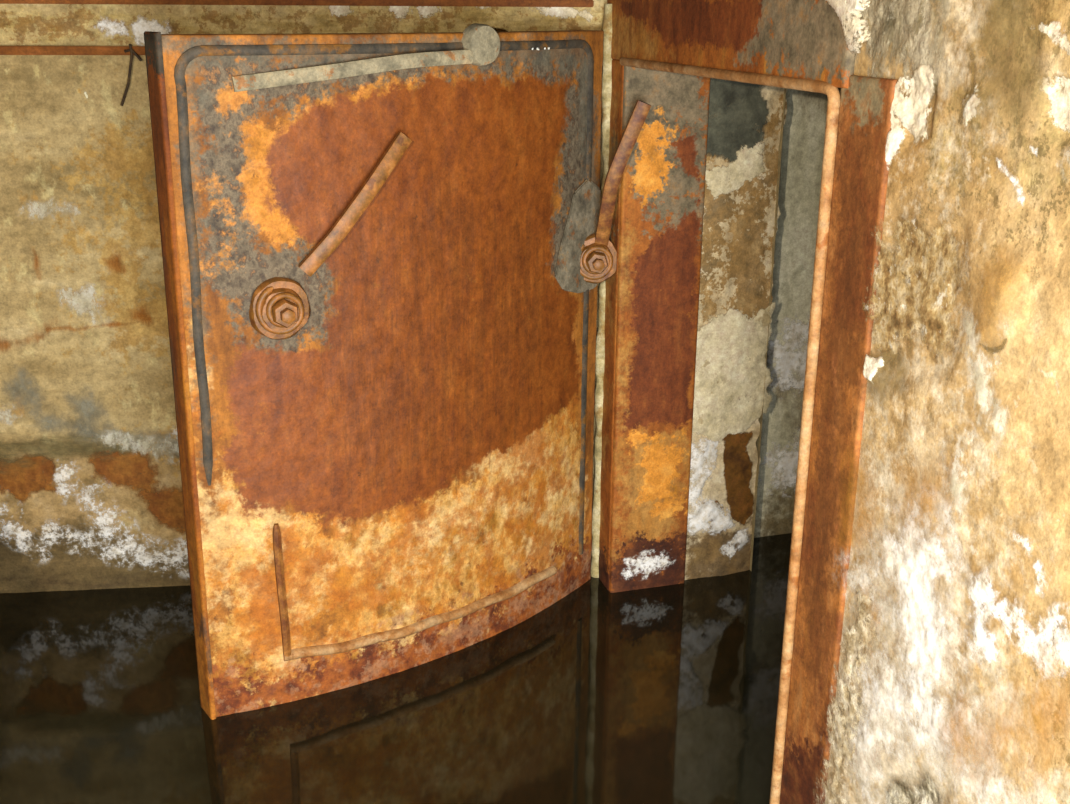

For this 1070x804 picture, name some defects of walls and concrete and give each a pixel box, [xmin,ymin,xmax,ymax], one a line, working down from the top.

flaking render [705,142,765,200]
flaking render [692,302,776,443]
efflorescence [963,312,1006,433]
leakage [0,400,189,577]
corrosion [704,432,754,525]
efflorescence [622,550,671,579]
efflorescence [847,433,1070,804]